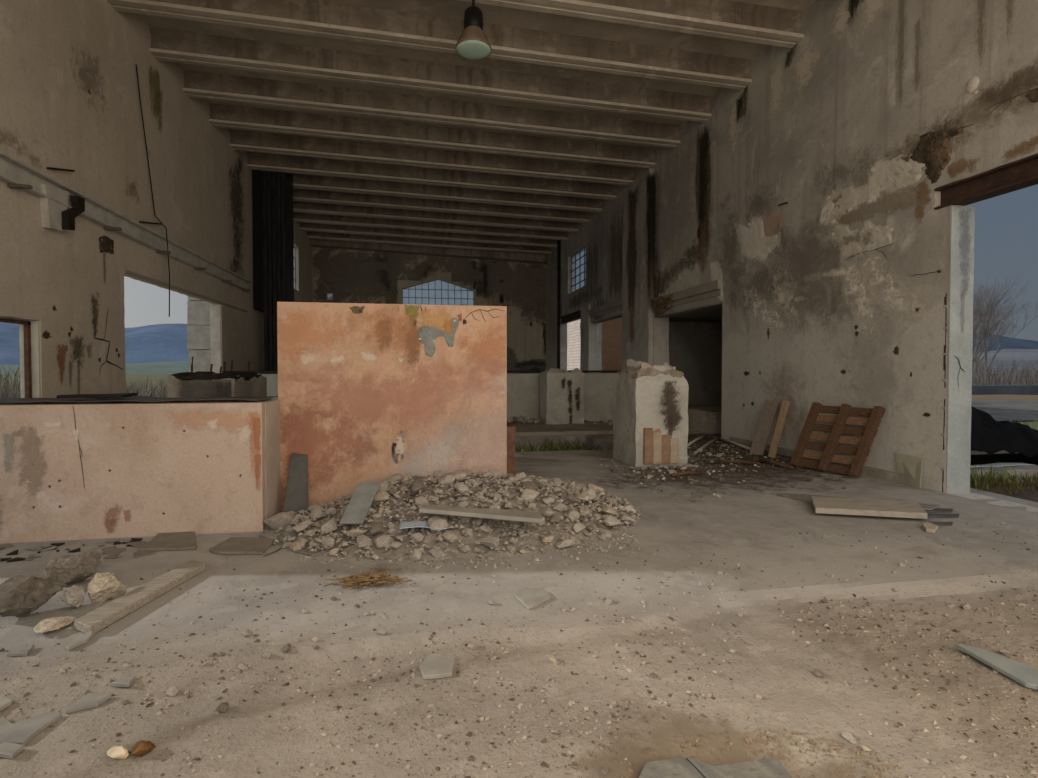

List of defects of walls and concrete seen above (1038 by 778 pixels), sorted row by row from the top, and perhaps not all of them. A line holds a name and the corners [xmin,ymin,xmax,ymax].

flaking render [818,126,963,260]
corrosion [948,159,976,178]
damp [892,67,1038,161]
corrosion [1005,136,1038,157]
damp [570,127,711,338]
damp [69,294,99,393]
peeling [417,318,467,357]
damp [3,427,46,495]
crack [73,408,84,482]
corrosion [250,413,261,487]
damp [661,381,682,437]
damp [602,433,847,490]